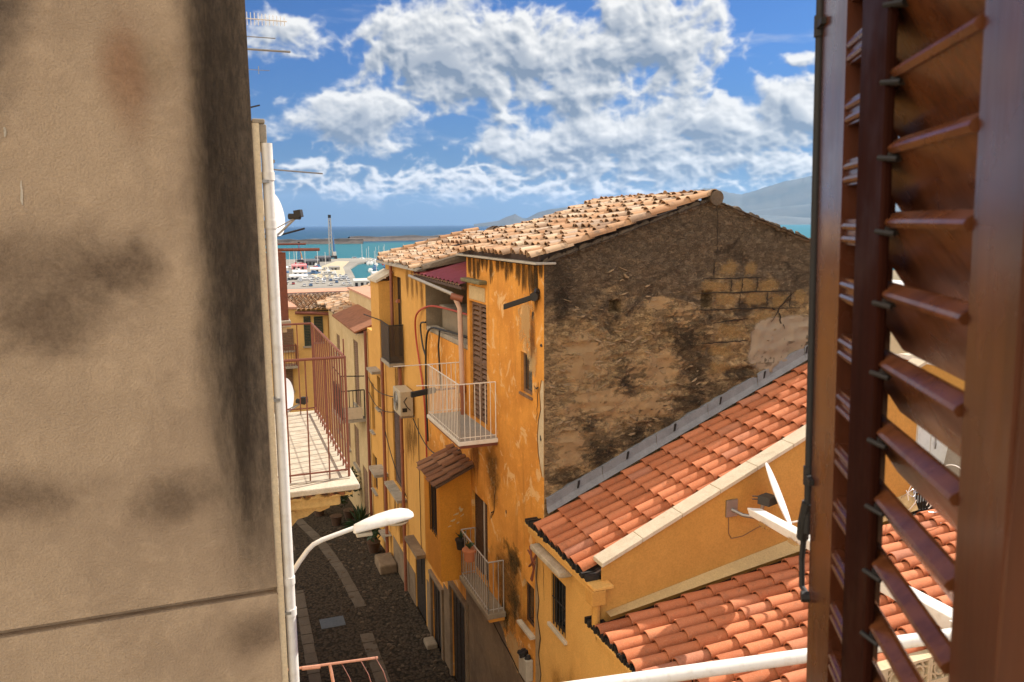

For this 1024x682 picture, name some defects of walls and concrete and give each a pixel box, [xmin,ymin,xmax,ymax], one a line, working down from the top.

leakage [191,0,272,511]
leakage [468,257,572,318]
spalling [645,261,809,373]
spalling [518,299,701,478]
leakage [471,447,497,490]
leakage [496,541,522,633]